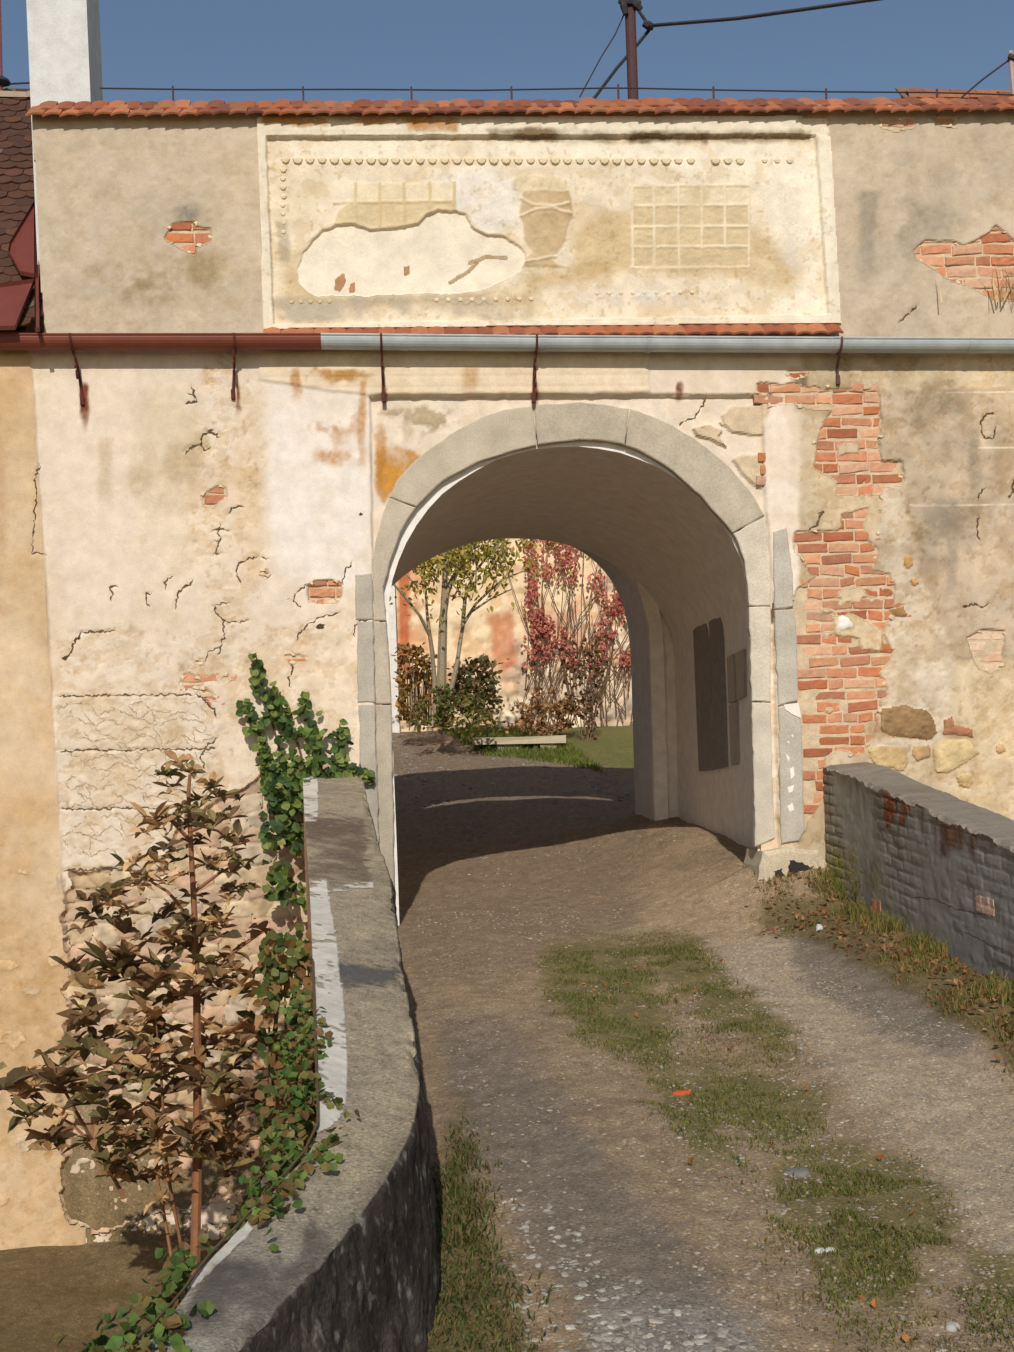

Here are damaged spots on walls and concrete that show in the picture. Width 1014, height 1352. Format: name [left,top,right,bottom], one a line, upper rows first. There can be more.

flaking render [164,221,213,256]
flaking render [913,224,1014,301]
flaking render [200,485,228,508]
flaking render [306,579,343,604]
flaking render [692,366,980,833]
flaking render [178,657,238,706]
flaking render [284,652,310,668]
flaking render [966,628,1007,674]